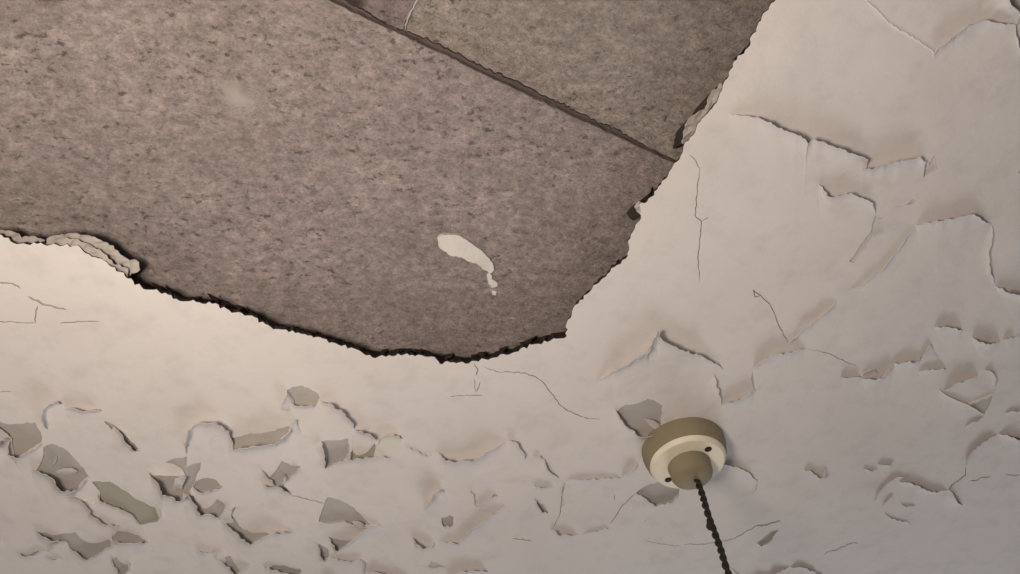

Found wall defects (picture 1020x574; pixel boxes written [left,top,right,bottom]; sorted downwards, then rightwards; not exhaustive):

peeling [866,0,1020,63]
flaking render [0,0,775,364]
crack [690,155,709,281]
peeling [728,113,937,263]
crack [0,282,100,324]
crack [753,290,788,342]
peeling [0,402,301,574]
peeling [228,386,392,505]
peeling [311,497,382,574]
crack [451,363,599,420]
peeling [595,331,724,447]
peeling [840,326,999,430]